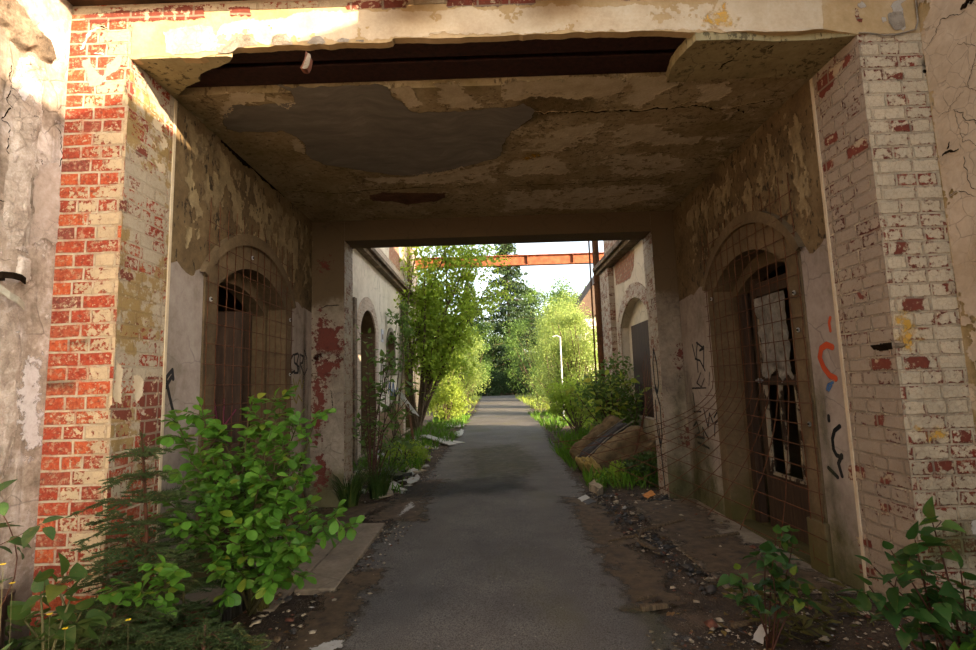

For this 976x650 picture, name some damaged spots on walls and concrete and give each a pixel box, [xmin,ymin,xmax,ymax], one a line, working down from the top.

peeling [85,0,823,56]
crack [0,65,15,154]
peeling [185,116,313,285]
peeling [219,92,296,119]
peeling [390,86,422,109]
peeling [433,81,483,110]
peeling [681,113,838,267]
flaking render [846,138,869,159]
peeling [917,0,976,369]
crack [928,0,976,197]
flaking render [310,306,346,493]
flaking render [959,428,972,443]